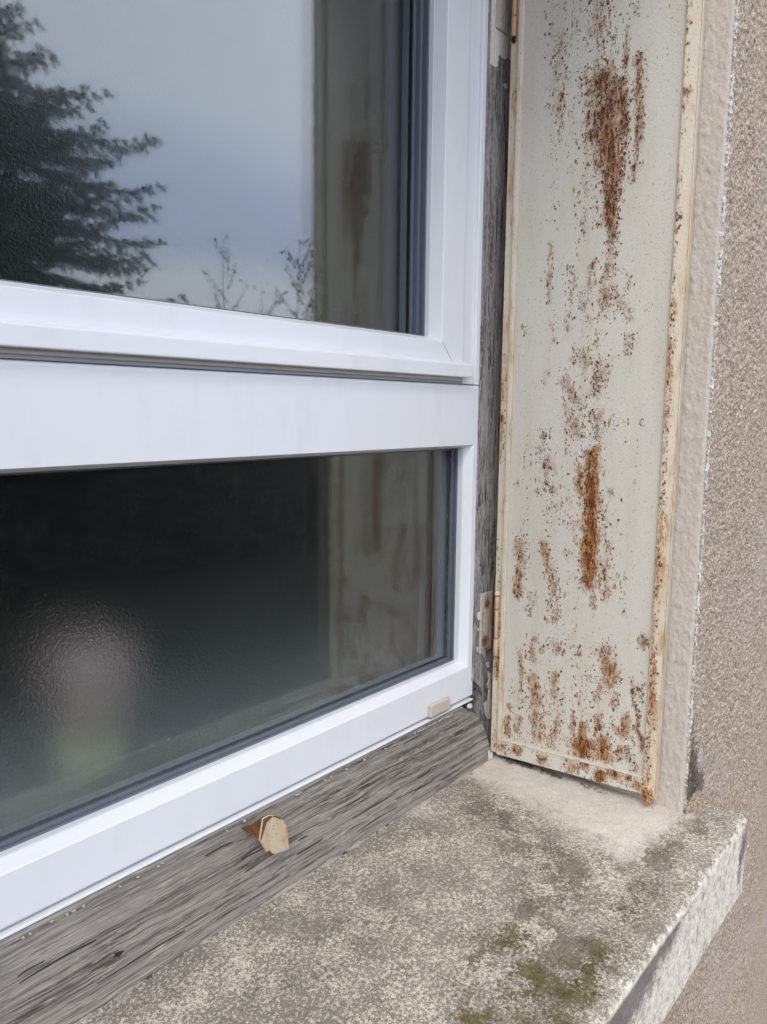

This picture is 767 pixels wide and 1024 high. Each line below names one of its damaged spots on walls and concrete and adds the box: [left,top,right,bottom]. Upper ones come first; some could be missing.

corrosion [481,0,683,808]
corrosion [681,0,694,139]